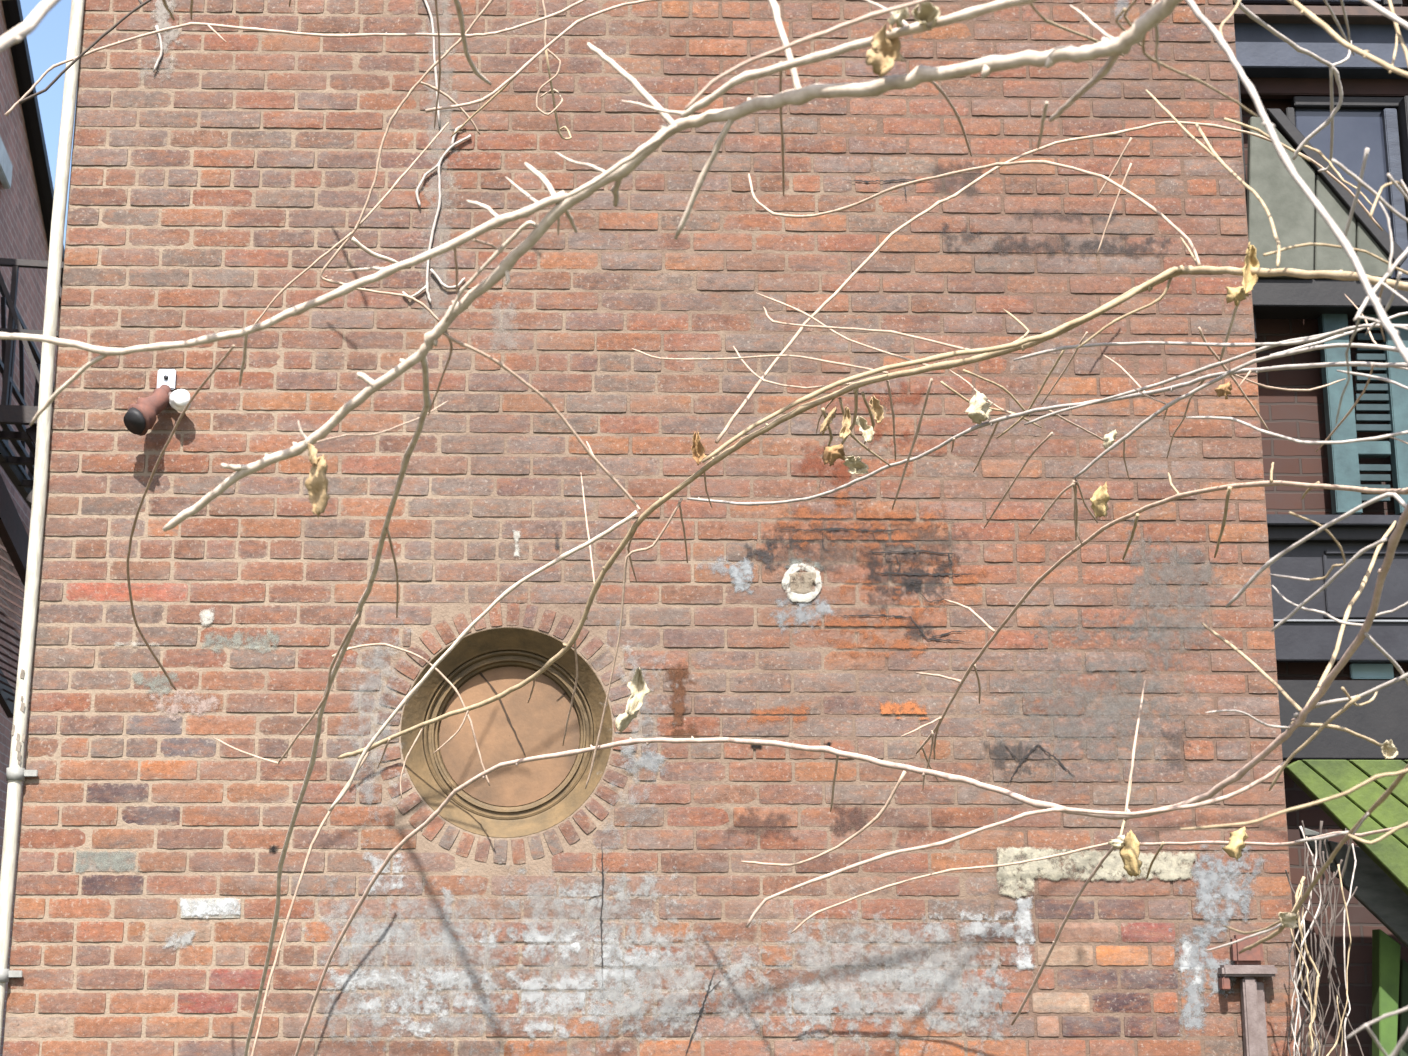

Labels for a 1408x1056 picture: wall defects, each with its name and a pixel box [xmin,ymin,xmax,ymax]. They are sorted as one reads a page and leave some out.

leakage [994,234,1168,257]
corrosion [668,664,695,730]
spalling [748,704,809,723]
spalling [880,701,929,720]
leakage [365,852,403,890]
leakage [424,929,494,948]
crack [584,844,604,986]
leakage [508,876,1035,1042]
leakage [1171,846,1263,1030]
leakage [331,969,495,1037]